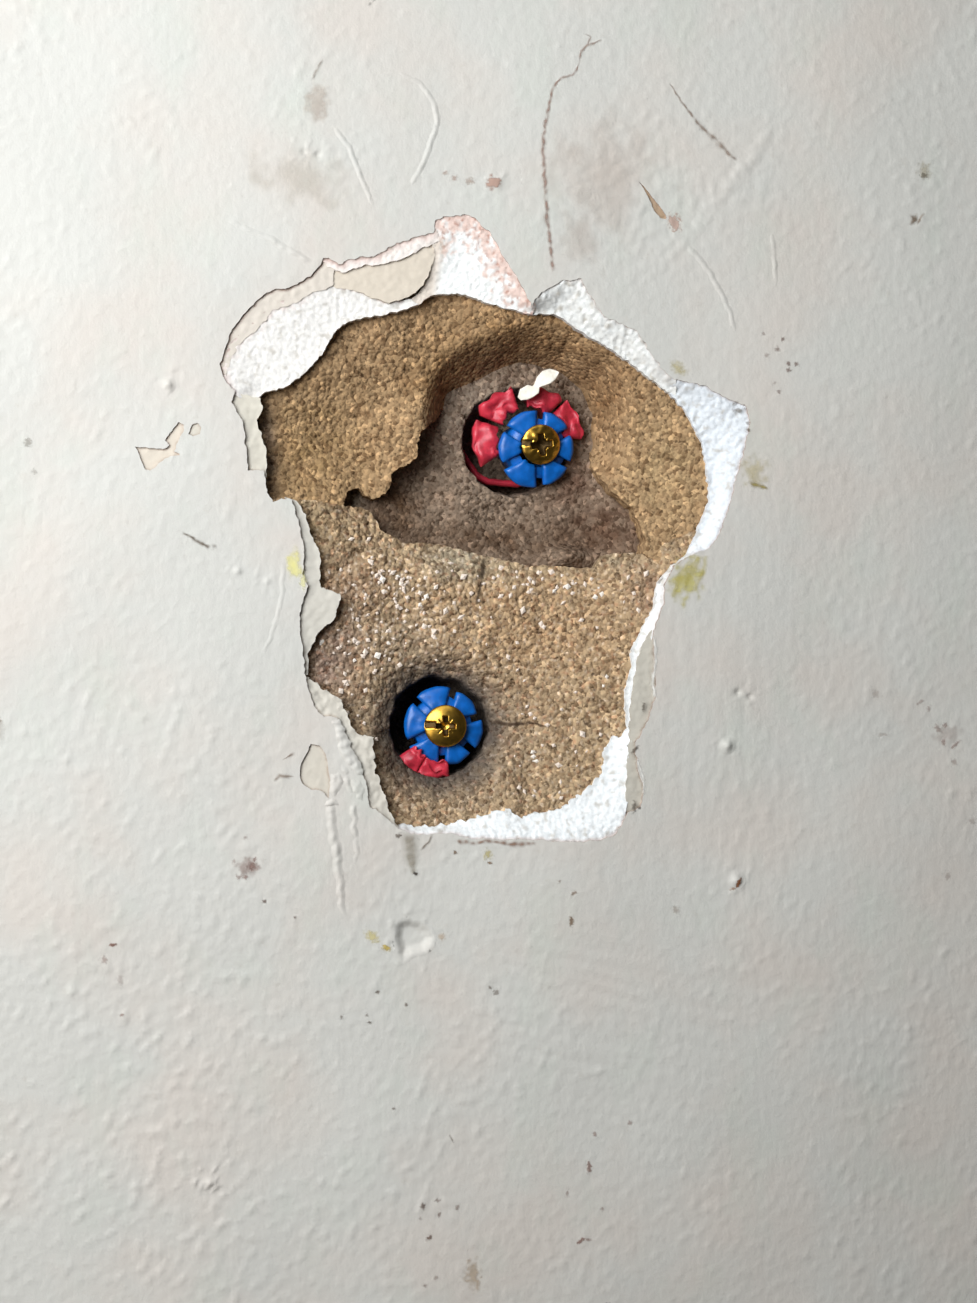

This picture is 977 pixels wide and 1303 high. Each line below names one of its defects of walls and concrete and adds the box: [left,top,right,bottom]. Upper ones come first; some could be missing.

peeling [136,422,201,470]
spalling [220,215,750,842]